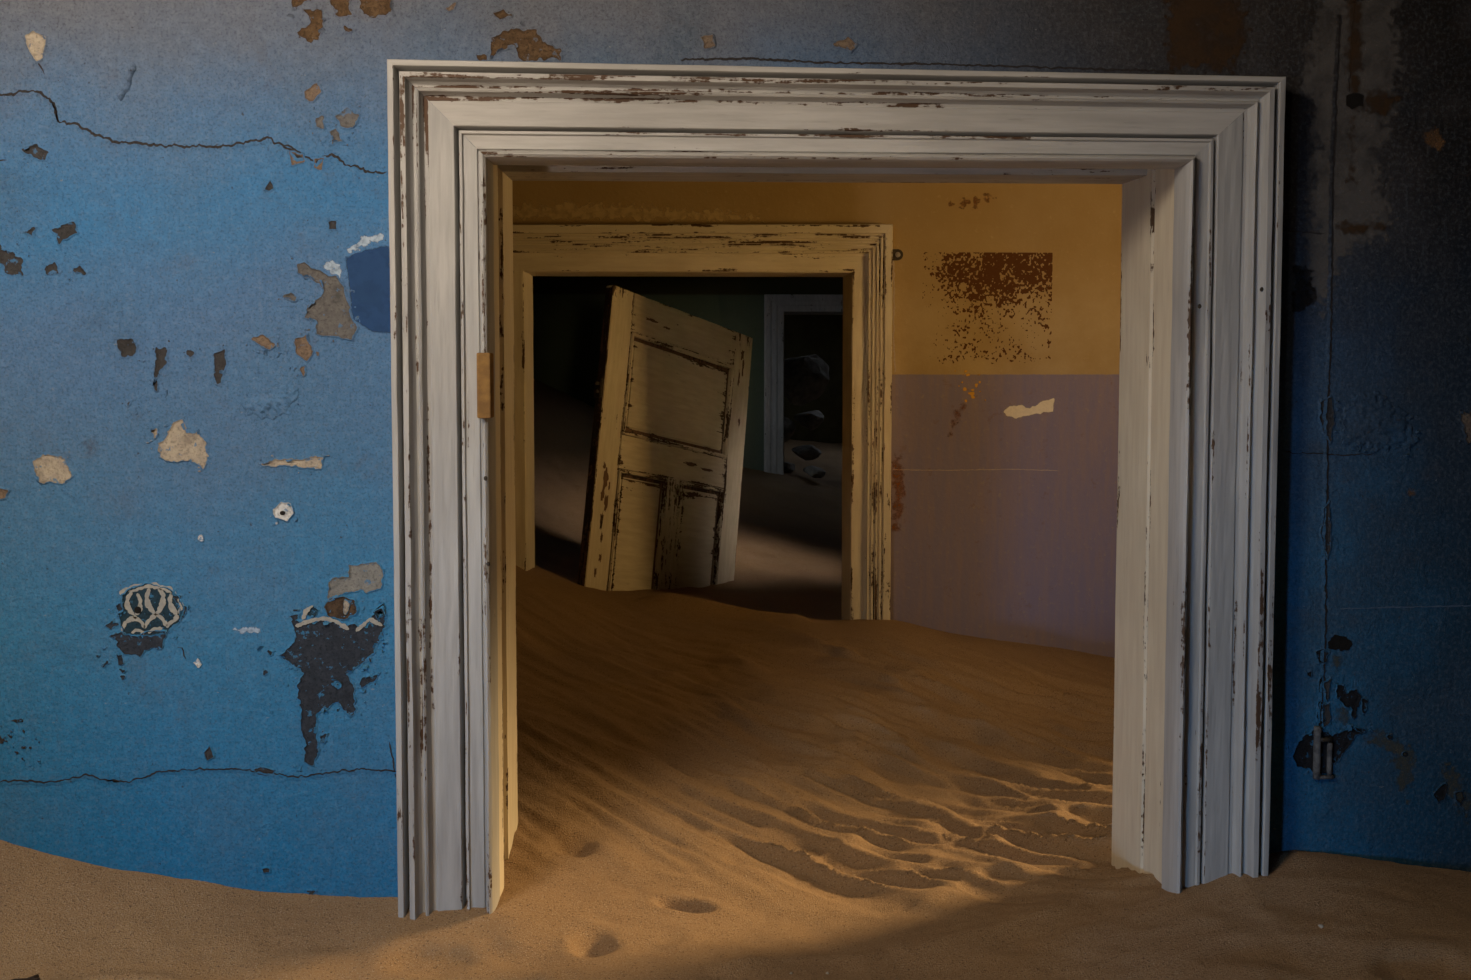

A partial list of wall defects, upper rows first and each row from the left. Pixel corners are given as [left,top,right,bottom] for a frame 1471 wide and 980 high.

peeling [287,0,396,50]
peeling [471,8,568,63]
crack [0,63,387,178]
peeling [245,255,360,378]
peeling [115,332,229,472]
peeling [26,448,80,491]
peeling [94,581,191,681]
crack [0,742,396,787]
peeling [253,560,392,776]
flaking render [1286,635,1408,782]